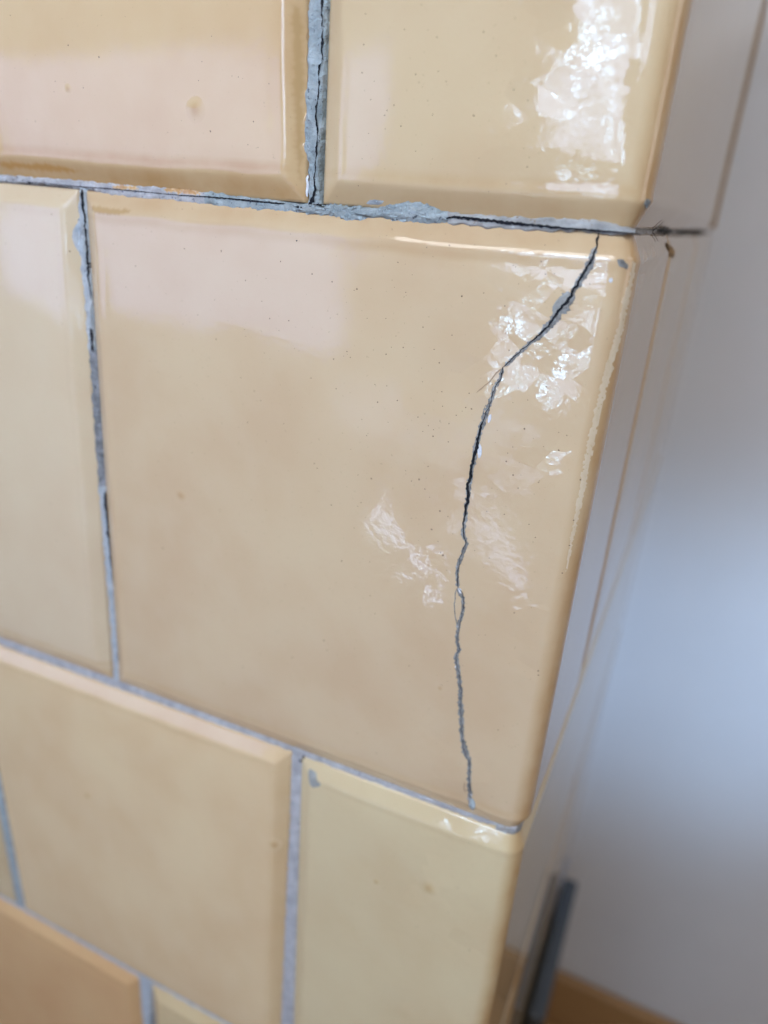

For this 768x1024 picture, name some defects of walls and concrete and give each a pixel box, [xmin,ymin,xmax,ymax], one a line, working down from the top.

crack [446,216,640,810]